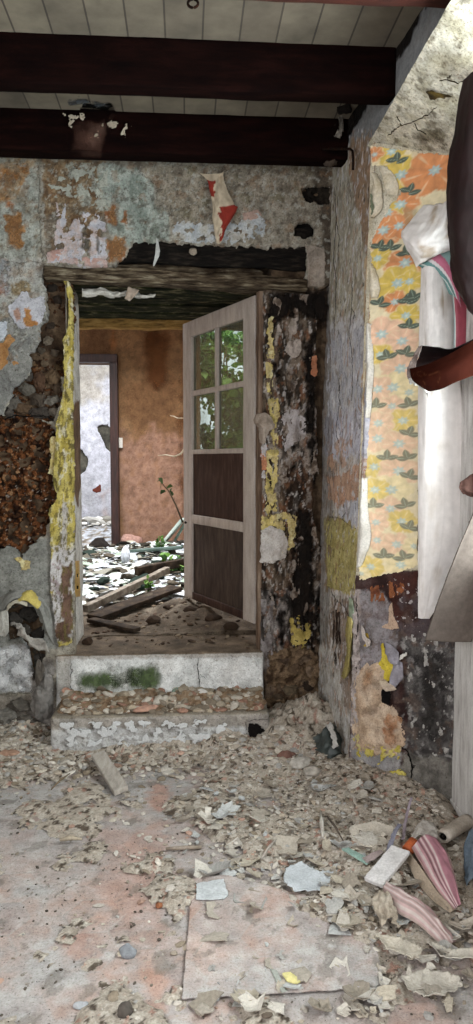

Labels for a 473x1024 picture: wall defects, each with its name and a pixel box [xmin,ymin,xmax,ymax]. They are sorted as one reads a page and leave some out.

peeling [90,120,128,138]
crack [388,107,437,135]
peeling [46,164,110,268]
peeling [172,209,266,245]
spalling [302,187,330,205]
peeling [0,245,454,992]
water stain [268,508,320,661]
peeling [431,837,473,948]